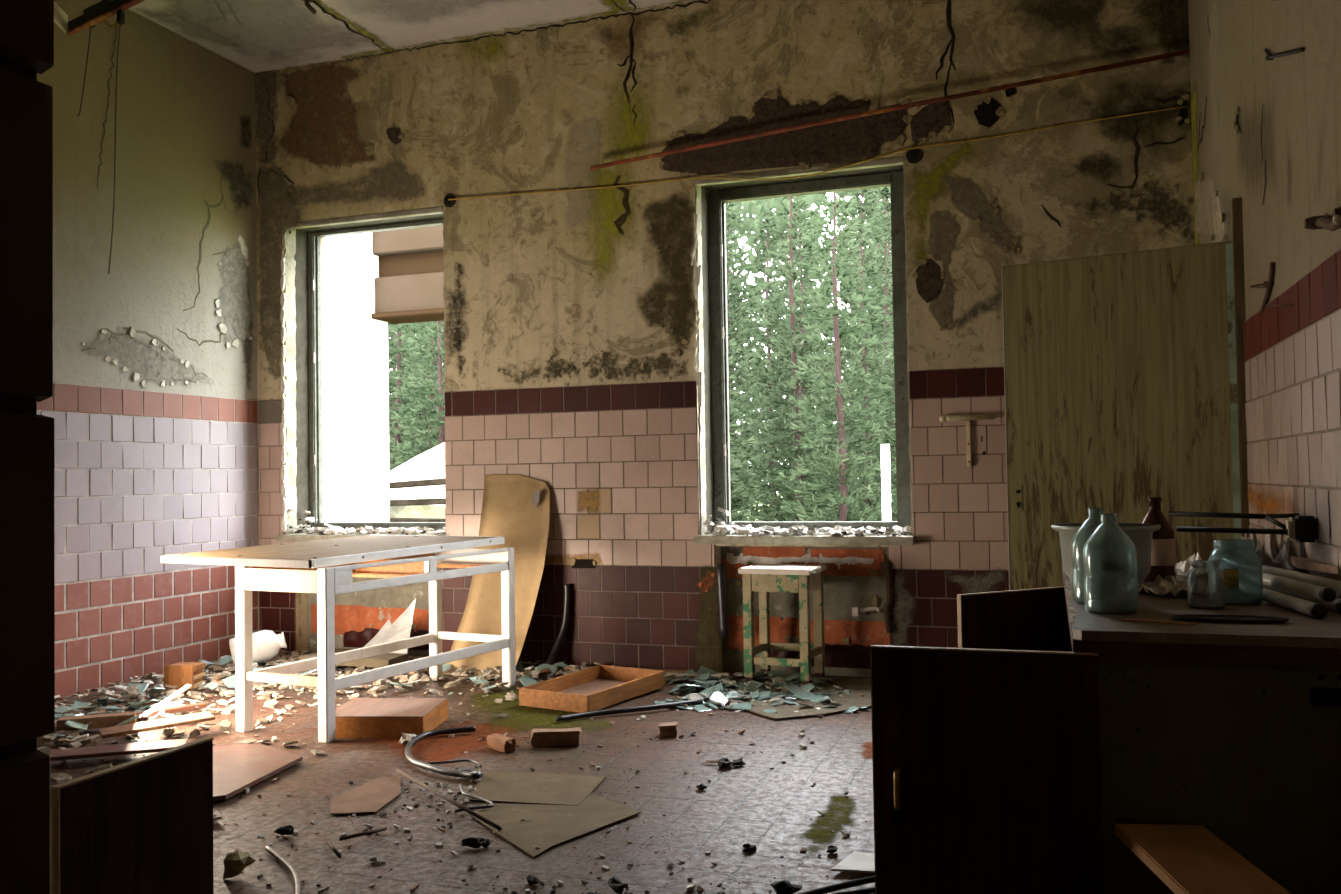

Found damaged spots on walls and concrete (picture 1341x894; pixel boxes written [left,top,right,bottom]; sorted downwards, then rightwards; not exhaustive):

leakage [145,0,366,57]
crack [313,0,711,130]
crack [936,0,956,124]
spalling [386,124,404,145]
spalling [659,90,952,175]
leakage [1082,85,1192,148]
mould [1076,156,1117,179]
mould [1076,180,1195,243]
flaking render [214,63,374,532]
flaking render [81,327,208,388]
mould [243,324,252,388]
mould [498,345,688,383]